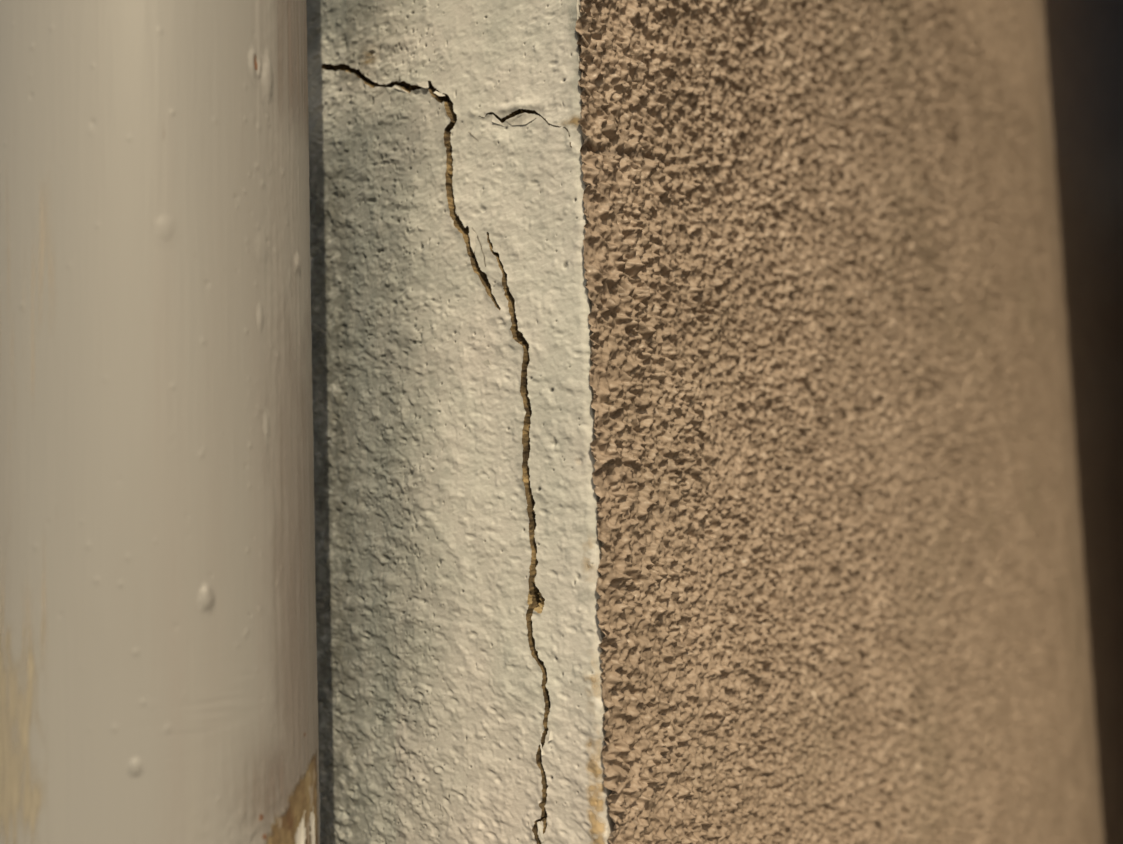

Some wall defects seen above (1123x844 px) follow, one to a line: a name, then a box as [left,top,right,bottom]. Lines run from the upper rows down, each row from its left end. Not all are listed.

crack [321,63,572,844]